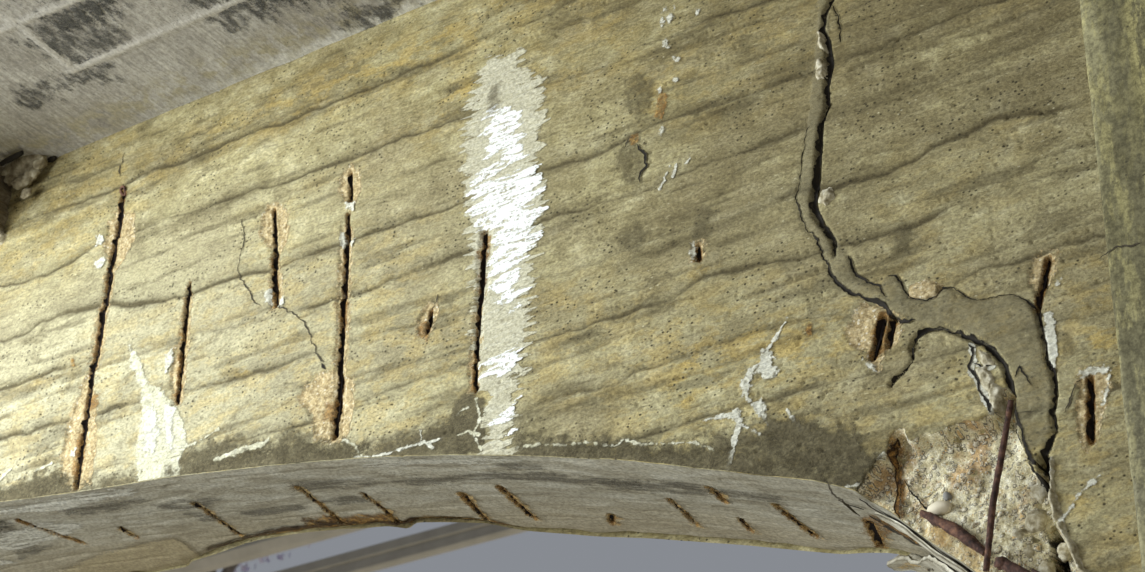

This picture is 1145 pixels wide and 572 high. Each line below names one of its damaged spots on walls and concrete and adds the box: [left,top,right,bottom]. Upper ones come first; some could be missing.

leakage [11,0,127,109]
leakage [182,0,403,34]
crack [795,0,1080,472]
leakage [287,317,887,506]
leakage [241,505,307,517]
rust [207,514,519,551]
spalling [857,388,1090,572]